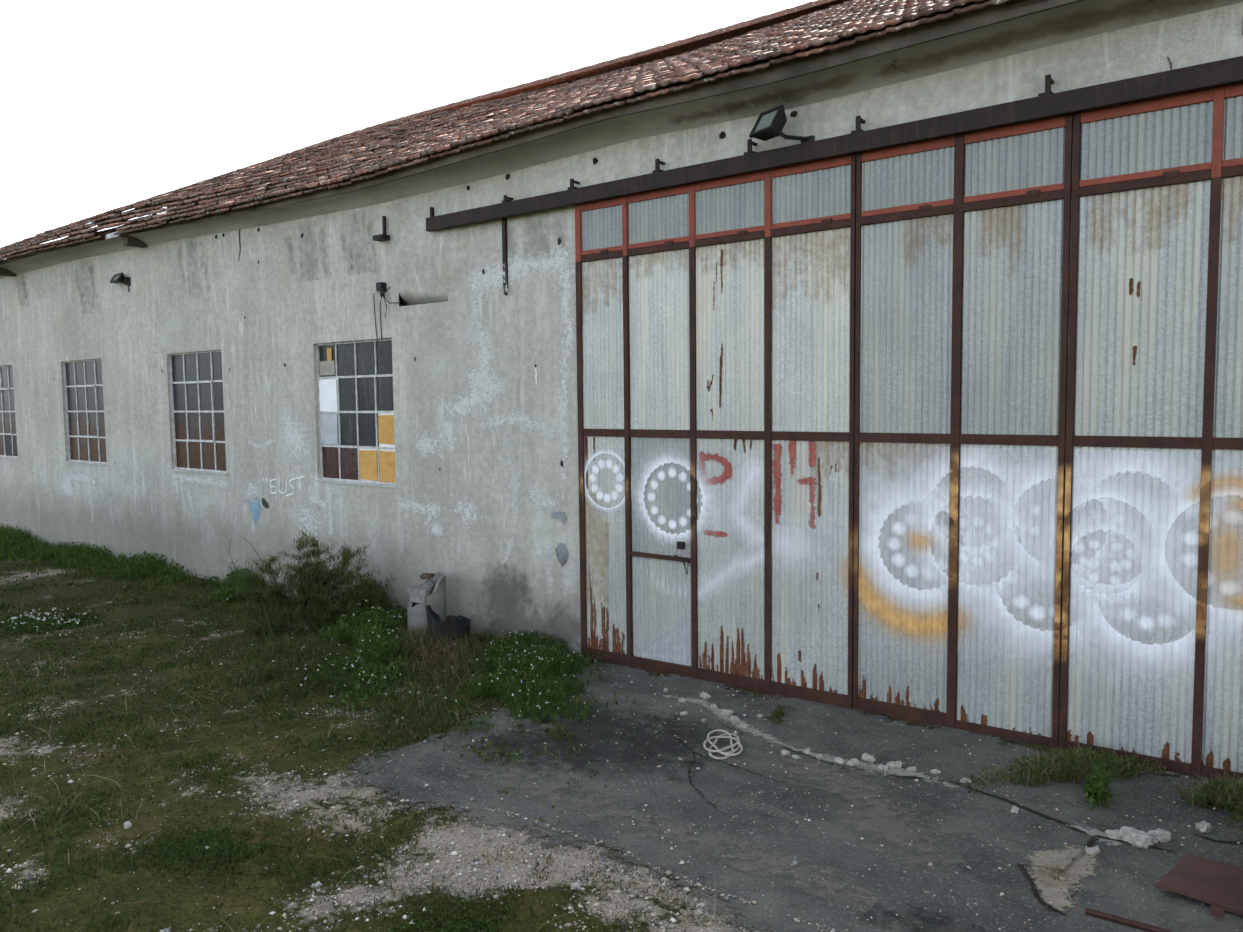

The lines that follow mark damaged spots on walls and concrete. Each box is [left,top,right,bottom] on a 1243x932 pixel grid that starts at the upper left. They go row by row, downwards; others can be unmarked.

rust [587,565,625,654]
rust [699,626,838,693]
rust [858,675,940,712]
rust [961,705,987,726]
rust [1066,730,1094,745]
rust [1162,741,1181,762]
rust [1202,751,1231,771]